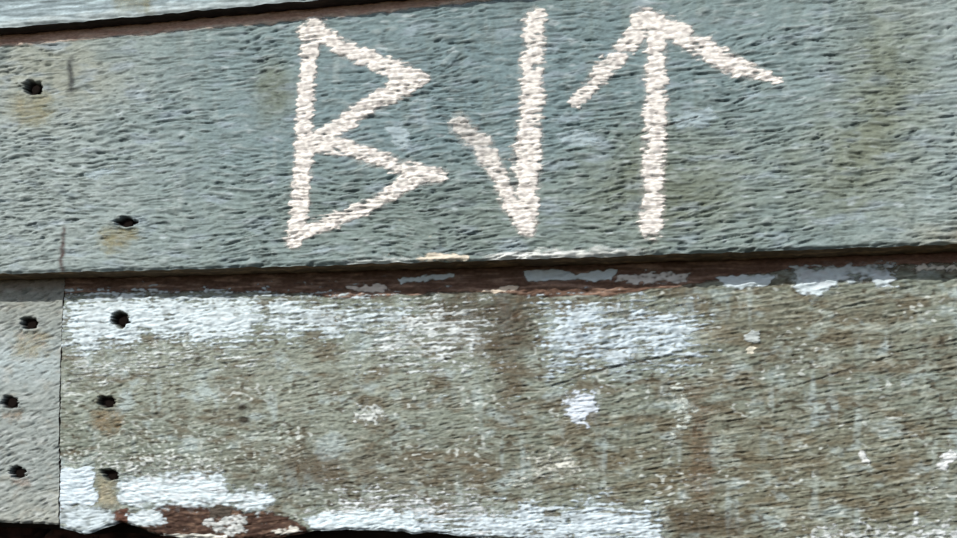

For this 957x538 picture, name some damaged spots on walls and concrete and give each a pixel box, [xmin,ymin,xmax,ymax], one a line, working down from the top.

peeling [716,274,775,289]
peeling [789,263,899,296]
peeling [916,263,957,271]
peeling [61,248,714,437]
peeling [744,330,760,354]
peeling [937,449,957,470]
peeling [59,447,662,538]
peeling [810,512,957,538]